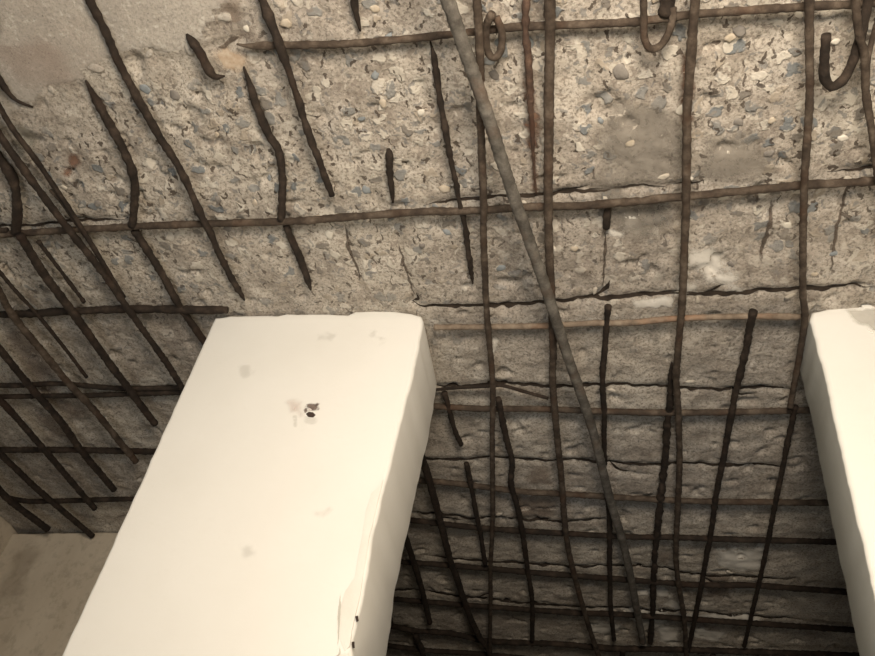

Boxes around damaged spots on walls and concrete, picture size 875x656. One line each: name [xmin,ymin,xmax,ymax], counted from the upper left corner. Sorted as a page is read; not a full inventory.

corrosion [218,48,245,69]
corrosion [63,154,80,176]
crack [412,280,875,308]
spalling [137,313,207,385]
spalling [0,227,184,539]
crack [438,380,784,395]
spalling [605,316,677,539]
crack [426,455,793,471]
spalling [678,308,860,656]
spalling [386,391,493,656]
crack [425,554,792,582]
crack [395,588,800,620]